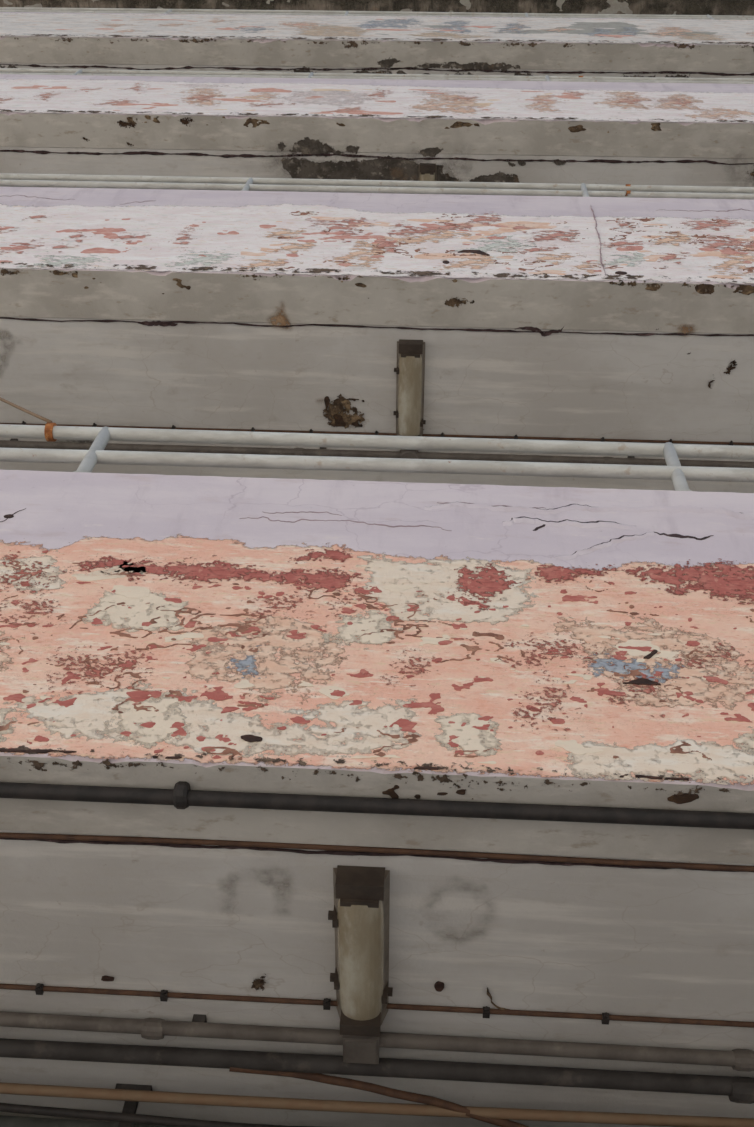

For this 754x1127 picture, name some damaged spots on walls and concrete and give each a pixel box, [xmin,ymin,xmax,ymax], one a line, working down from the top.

peeling [0,13,754,50]
peeling [0,58,754,133]
peeling [278,137,526,183]
peeling [0,203,754,299]
spalling [323,394,365,429]
crack [239,502,714,560]
peeling [0,534,754,804]